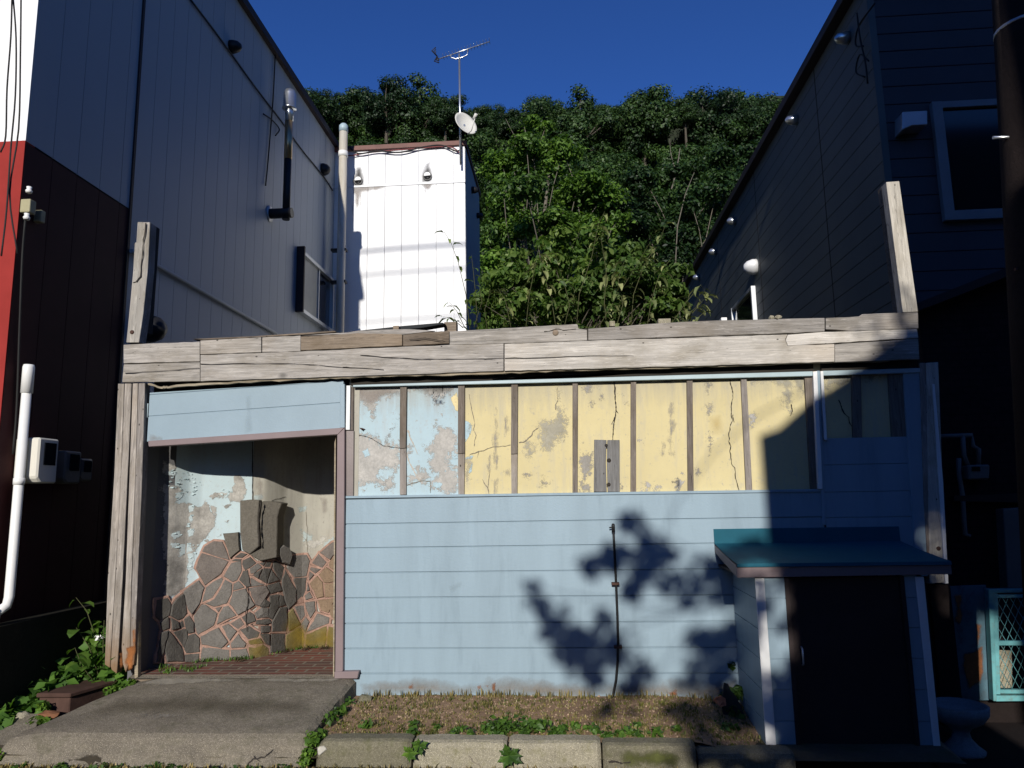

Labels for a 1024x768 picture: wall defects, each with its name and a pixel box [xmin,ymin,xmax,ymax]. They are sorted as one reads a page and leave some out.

peeling [354,385,473,495]
crack [469,396,538,493]
peeling [524,406,568,458]
crack [611,381,619,440]
crack [728,379,739,489]
peeling [158,460,263,597]